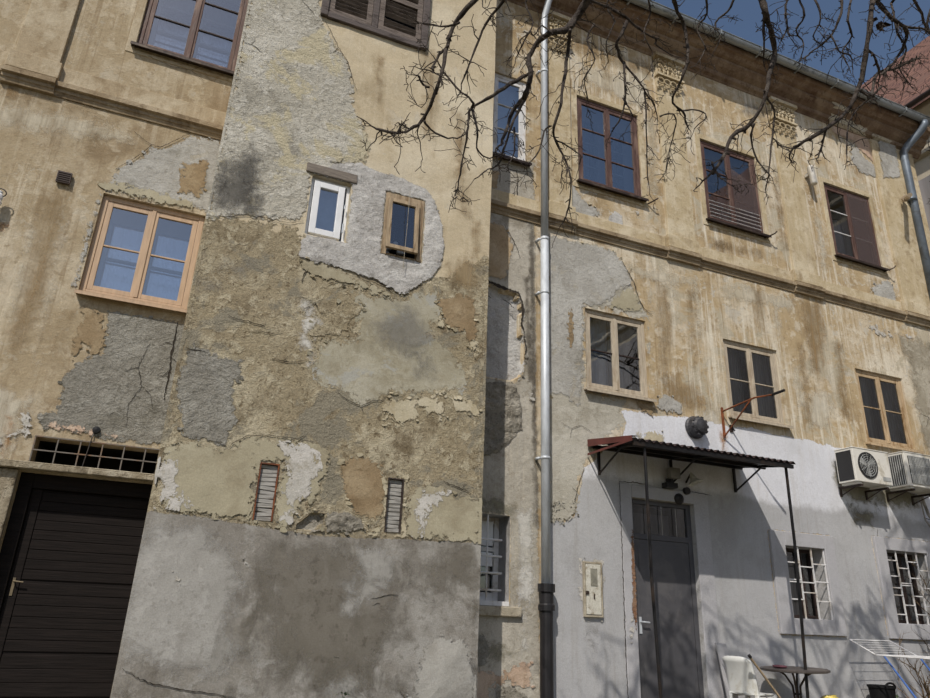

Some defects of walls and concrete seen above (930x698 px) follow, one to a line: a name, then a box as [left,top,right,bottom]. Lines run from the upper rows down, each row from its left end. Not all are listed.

flaking render [850,141,900,178]
flaking render [382,222,536,457]
flaking render [548,235,631,406]
damp [803,304,823,370]
flaking render [0,306,244,446]
crack [126,322,202,424]
flaking render [280,500,326,534]
crack [122,668,235,698]
flaking render [477,633,535,698]